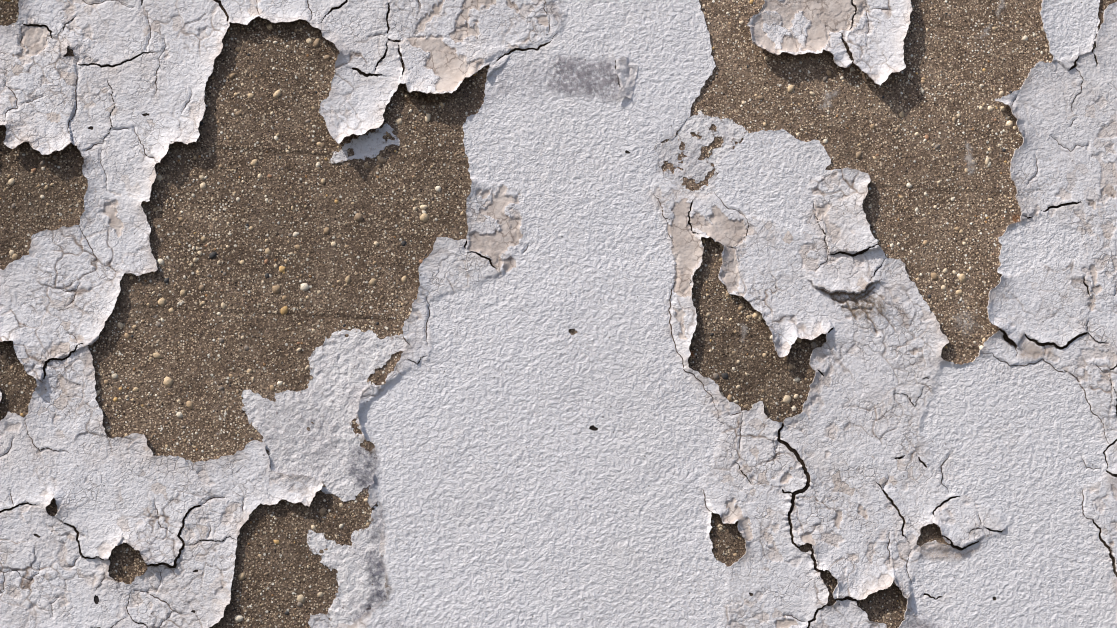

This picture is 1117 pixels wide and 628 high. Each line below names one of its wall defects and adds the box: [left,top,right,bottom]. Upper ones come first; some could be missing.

crack [20,0,166,190]
crack [353,3,405,77]
peeling [0,0,557,468]
peeling [661,0,1117,423]
crack [61,520,109,591]
peeling [46,470,190,584]
crack [91,497,244,628]
peeling [209,484,378,628]
peeling [709,498,753,567]
crack [775,423,822,573]
crack [876,454,1003,600]
crack [984,322,1117,577]